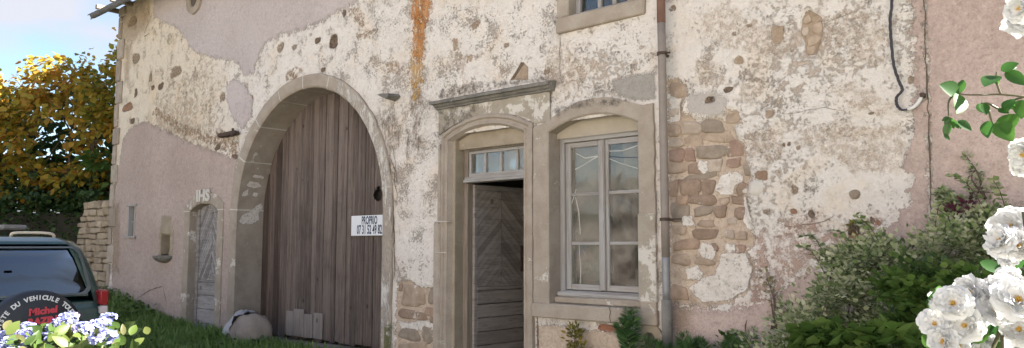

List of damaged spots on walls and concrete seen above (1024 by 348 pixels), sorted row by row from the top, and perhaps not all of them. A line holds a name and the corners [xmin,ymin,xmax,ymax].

corrosion [408,0,433,100]
peeling [111,0,378,330]
peeling [338,83,399,220]
spalling [667,0,1024,348]
spalling [381,249,433,348]